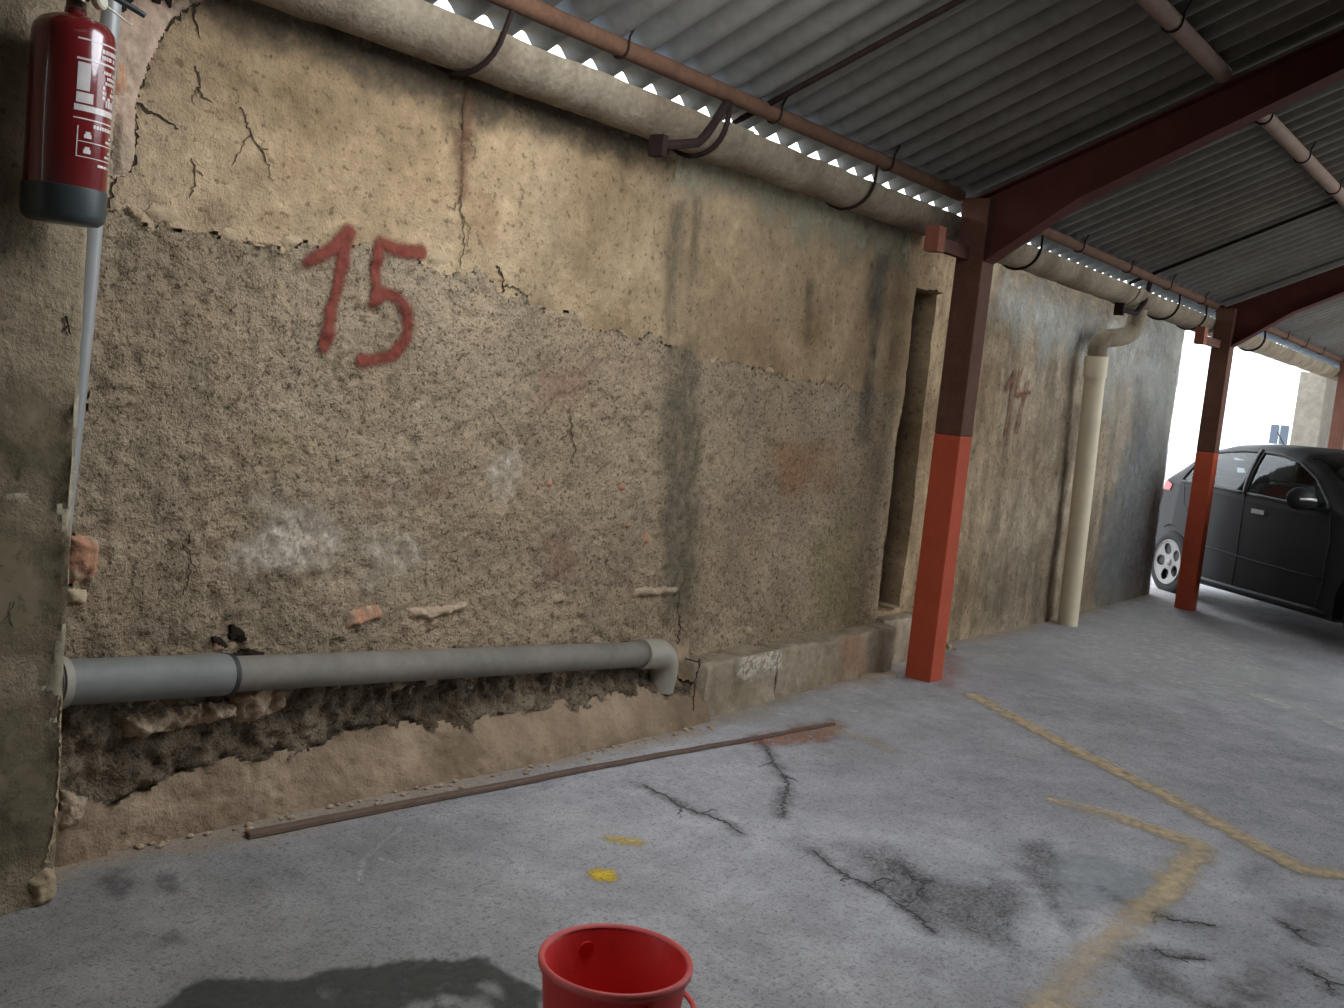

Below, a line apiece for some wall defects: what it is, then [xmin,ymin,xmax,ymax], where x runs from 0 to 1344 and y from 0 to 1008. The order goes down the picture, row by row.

flaking render [108,0,203,179]
crack [107,2,274,208]
spalling [28,203,901,905]
crack [643,785,742,833]
crack [759,740,798,817]
crack [813,850,937,933]
crack [1101,888,1216,964]
crack [1279,921,1344,990]